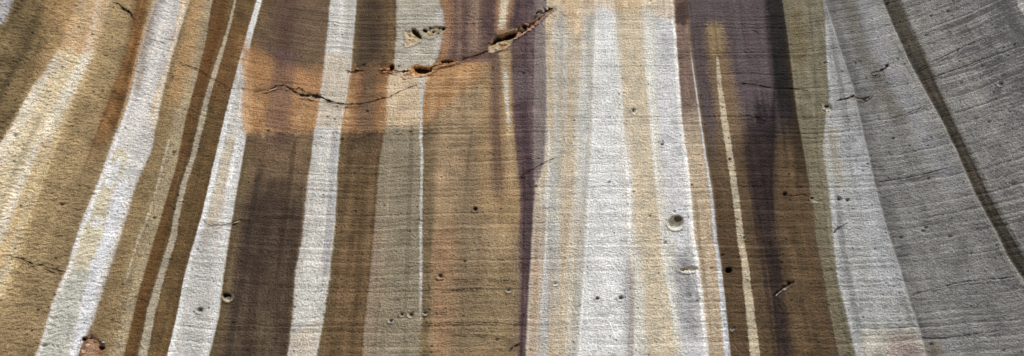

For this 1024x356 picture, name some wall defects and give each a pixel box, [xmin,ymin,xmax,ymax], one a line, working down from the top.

leakage [0,0,100,302]
crack [182,8,556,106]
spalling [379,57,456,79]
spalling [403,24,446,48]
leakage [33,0,838,356]
leakage [806,0,1024,356]